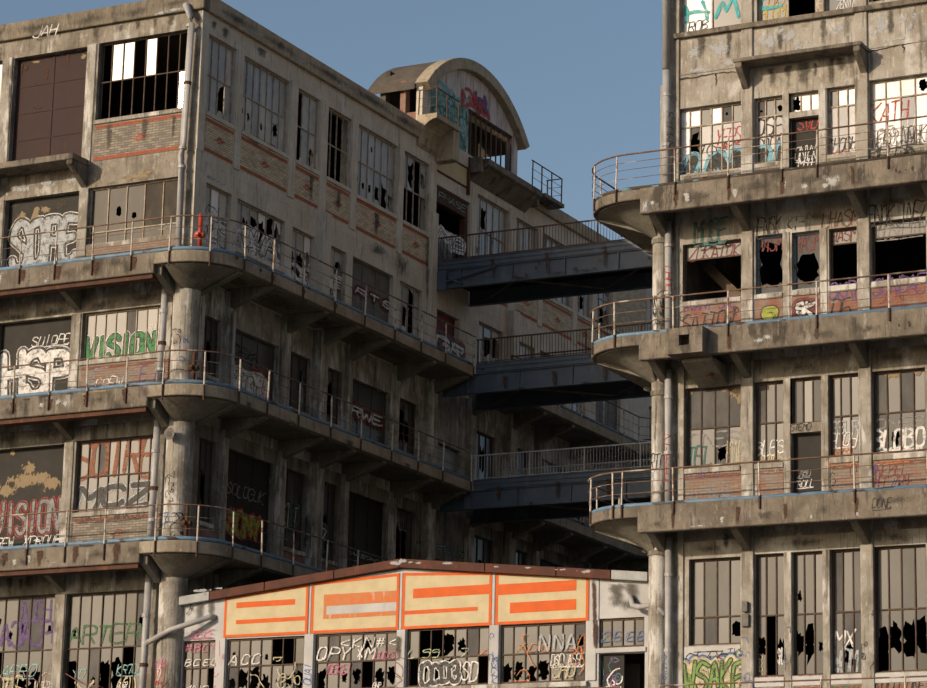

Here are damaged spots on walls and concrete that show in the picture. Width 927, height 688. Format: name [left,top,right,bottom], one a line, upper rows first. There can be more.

crack [680,71,733,84]
damp [784,63,817,81]
damp [828,58,845,79]
damp [609,583,636,607]
damp [196,601,213,619]